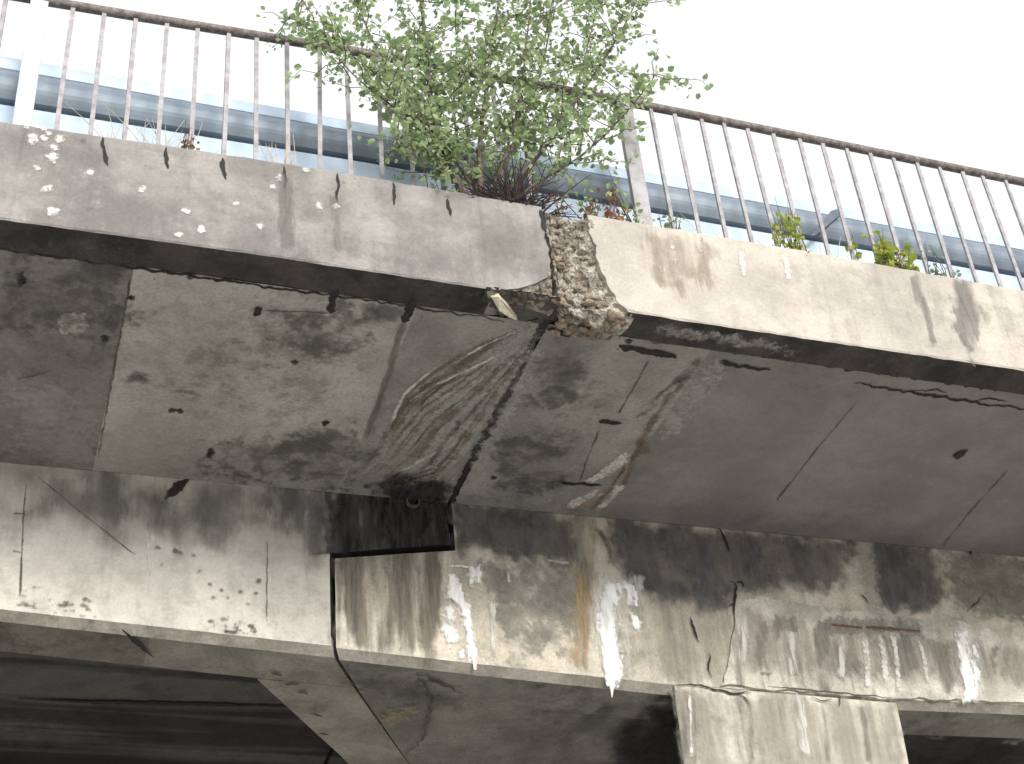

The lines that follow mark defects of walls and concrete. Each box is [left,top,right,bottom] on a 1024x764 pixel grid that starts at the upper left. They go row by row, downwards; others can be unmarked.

spalling [481,212,634,342]
crack [449,320,553,502]
crack [825,366,1024,410]
damp [251,429,576,670]
damp [594,575,644,725]
crack [729,581,744,615]
crack [677,618,887,707]